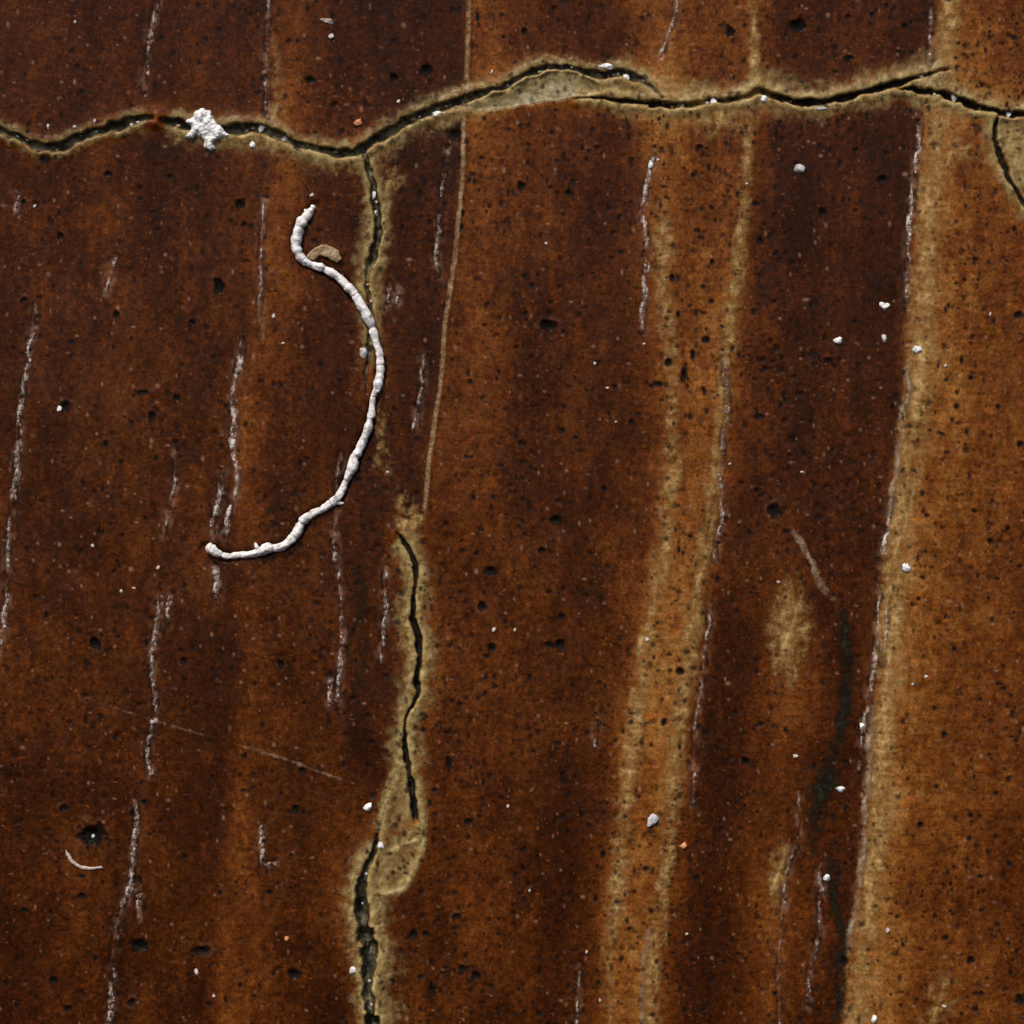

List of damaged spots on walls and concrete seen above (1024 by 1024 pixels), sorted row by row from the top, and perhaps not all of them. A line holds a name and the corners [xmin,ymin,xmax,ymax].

crack [0,1,1024,508]
crack [348,533,432,1024]